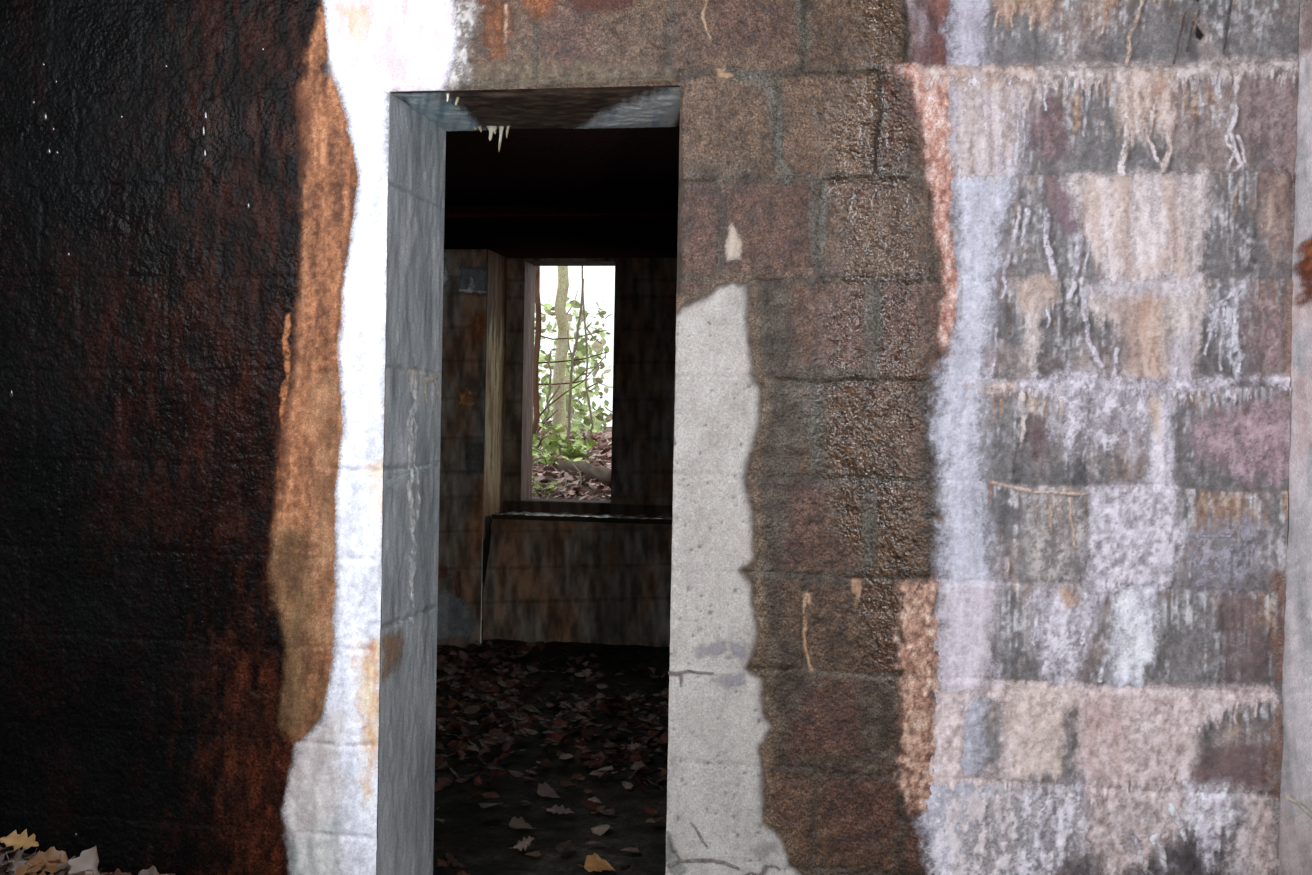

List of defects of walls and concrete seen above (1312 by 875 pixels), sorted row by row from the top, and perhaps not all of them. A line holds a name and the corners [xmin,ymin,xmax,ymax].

leakage [991,0,1055,31]
leakage [1124,0,1144,64]
rust [1284,238,1312,383]
leakage [990,57,1299,690]
spalling [666,831,685,875]
crack [667,822,780,875]
leakage [925,783,953,827]
leakage [1067,780,1188,875]
leakage [1167,780,1280,875]